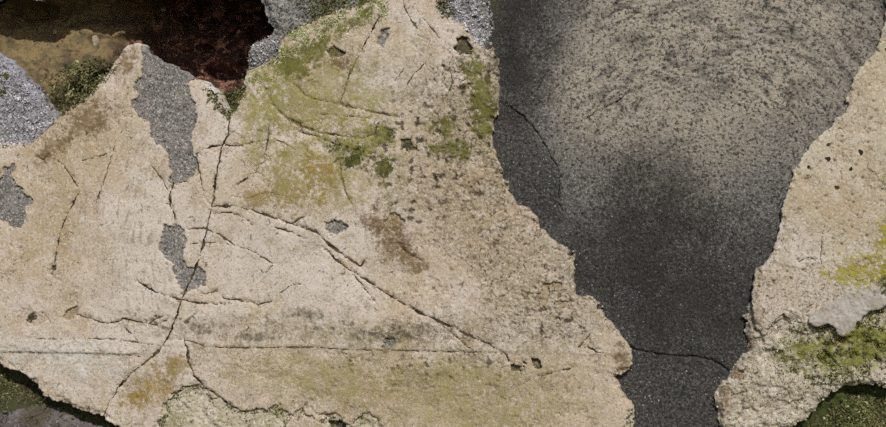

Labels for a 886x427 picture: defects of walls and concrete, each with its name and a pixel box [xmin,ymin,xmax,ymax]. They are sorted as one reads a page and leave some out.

spalling [0,0,275,185]
damp [244,54,384,138]
spalling [0,163,33,228]
crack [10,0,509,415]
damp [276,146,355,207]
spalling [159,224,206,295]
crack [630,345,730,372]
spalling [714,280,886,427]
spalling [158,385,382,427]